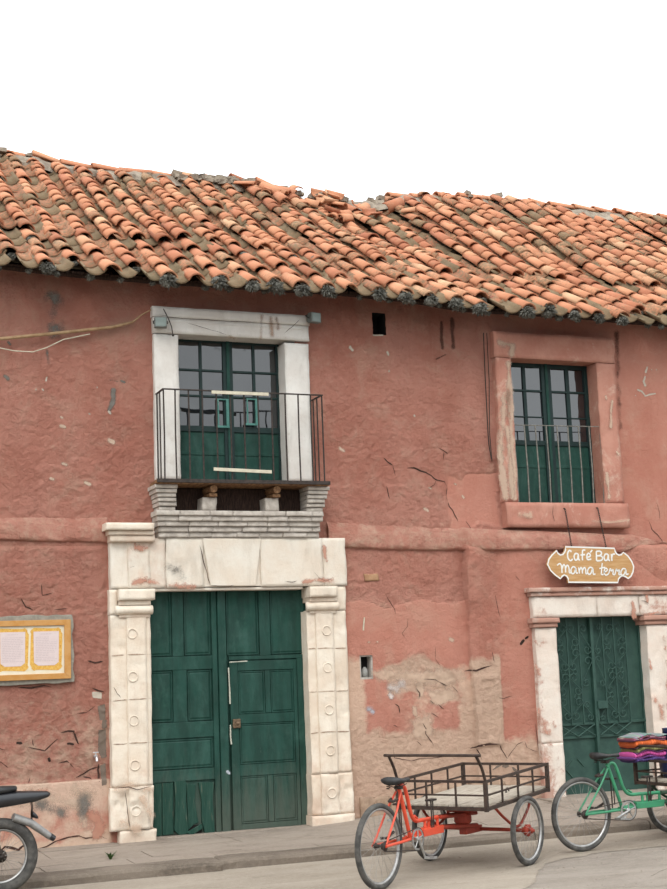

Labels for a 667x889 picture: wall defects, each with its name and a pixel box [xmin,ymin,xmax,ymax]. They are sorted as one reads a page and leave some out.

crack [384,449,470,527]
spalling [374,669,462,704]
crack [28,688,120,782]
spalling [413,707,432,738]
leakage [36,785,105,839]
crack [1,835,104,851]